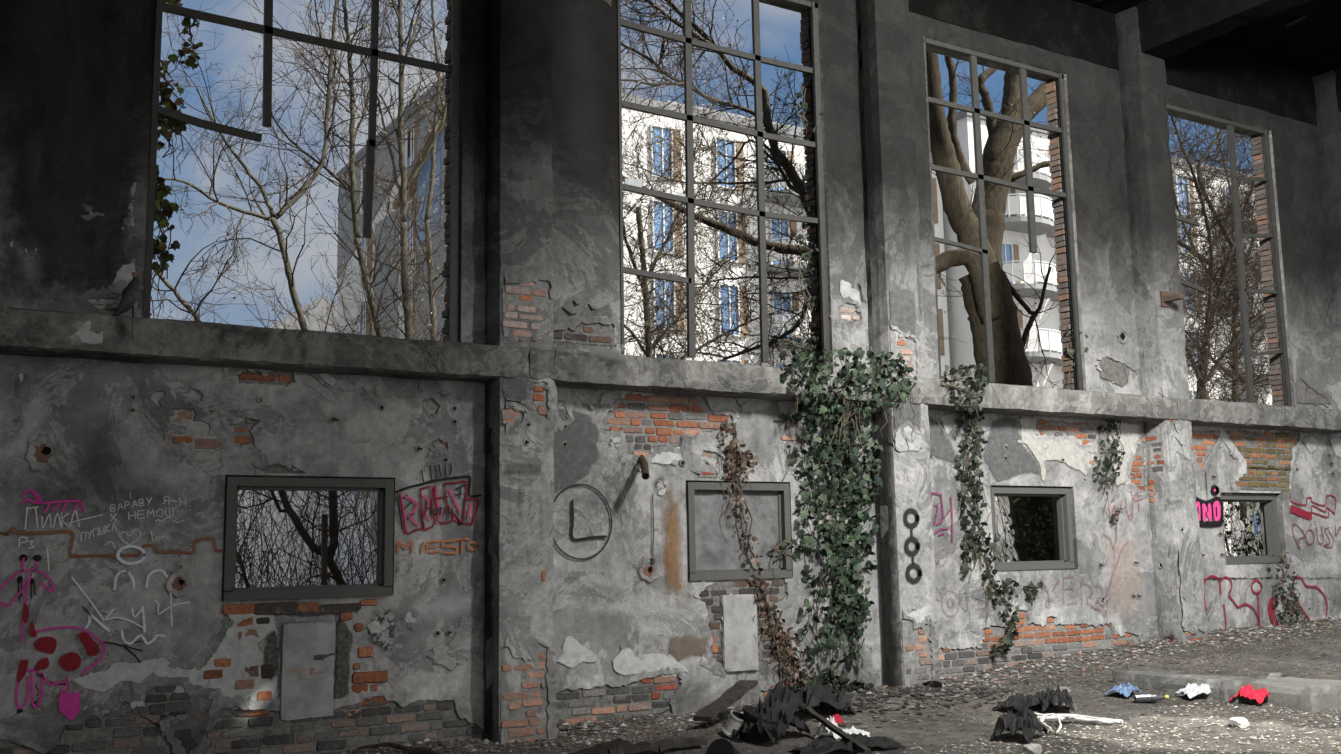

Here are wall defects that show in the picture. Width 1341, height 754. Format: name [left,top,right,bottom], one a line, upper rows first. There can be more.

peeling [890,261,923,379]
peeling [1097,356,1130,387]
flaking render [484,378,741,496]
flaking render [894,398,1341,509]
flaking render [0,599,484,754]
flaking render [501,578,835,744]